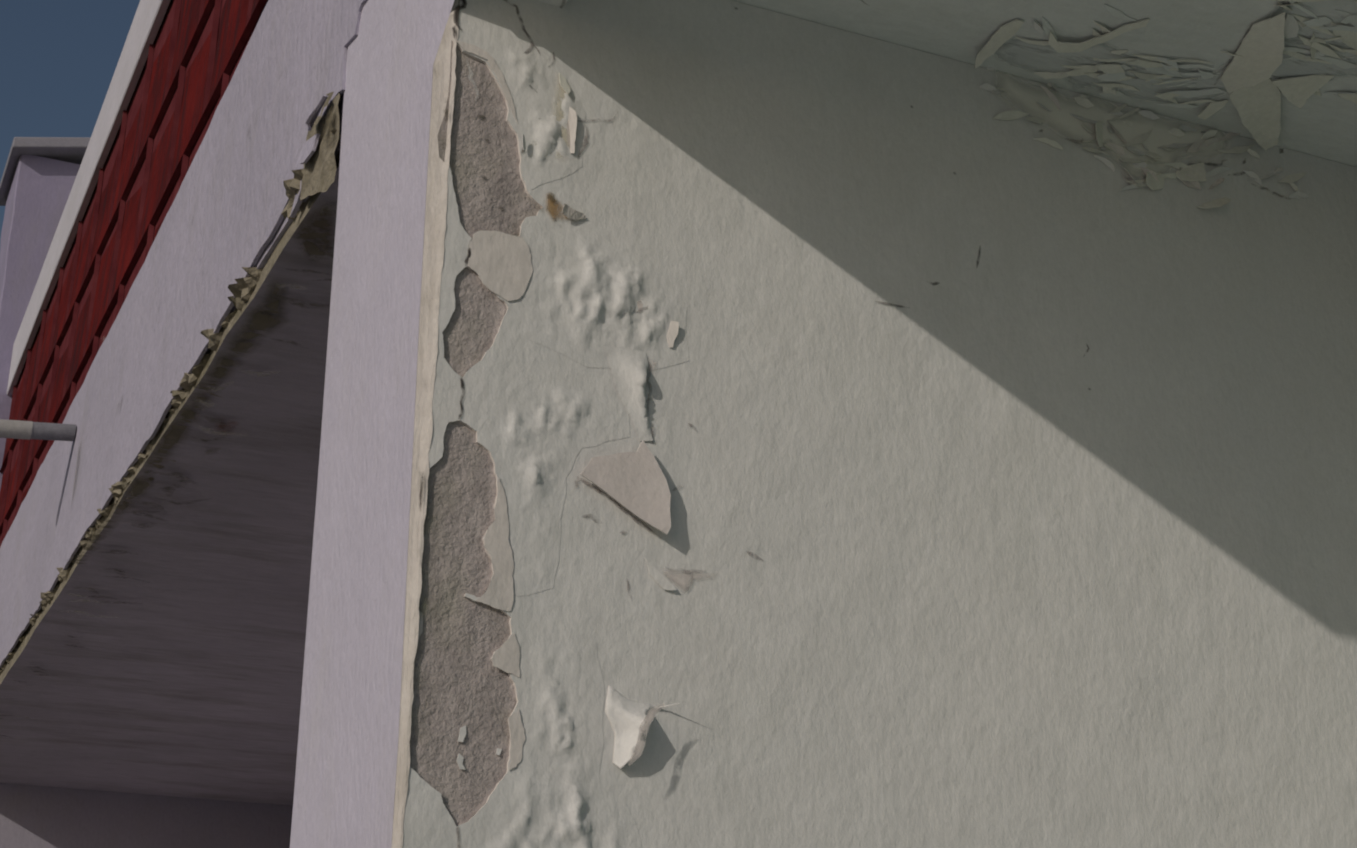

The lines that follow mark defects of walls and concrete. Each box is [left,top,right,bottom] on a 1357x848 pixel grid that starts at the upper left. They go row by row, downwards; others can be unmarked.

crack [452,0,467,38]
crack [514,5,555,59]
peeling [1033,0,1357,159]
flaking render [281,92,341,220]
peeling [437,41,541,377]
flaking render [80,267,263,548]
peeling [576,440,671,535]
flaking render [0,566,71,676]
peeling [410,422,526,826]